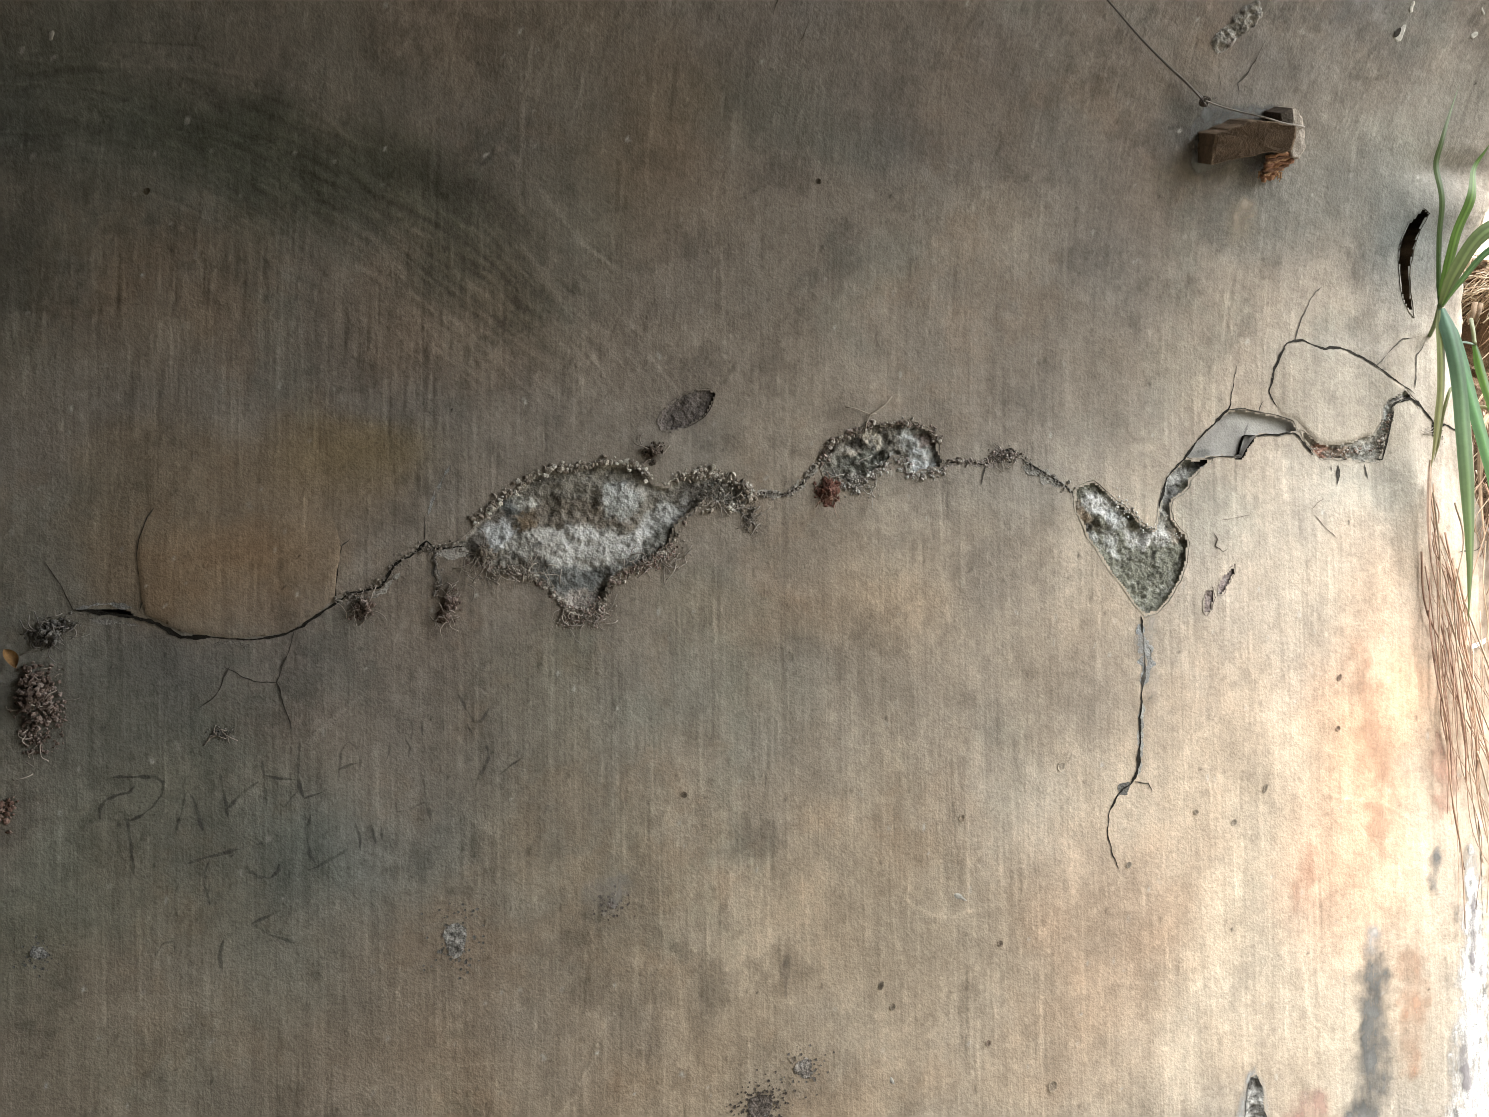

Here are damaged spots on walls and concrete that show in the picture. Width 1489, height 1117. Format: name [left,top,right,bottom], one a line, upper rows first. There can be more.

crack [45,466,469,732]
spalling [454,454,758,620]
spalling [657,388,715,433]
crack [735,459,824,523]
spalling [819,416,947,495]
crack [946,445,1076,497]
spalling [1073,388,1420,617]
crack [1159,208,1455,536]
crack [1107,617,1156,871]
spalling [1245,1074,1267,1117]
damp [1346,959,1391,1117]
damp [1445,844,1489,1117]